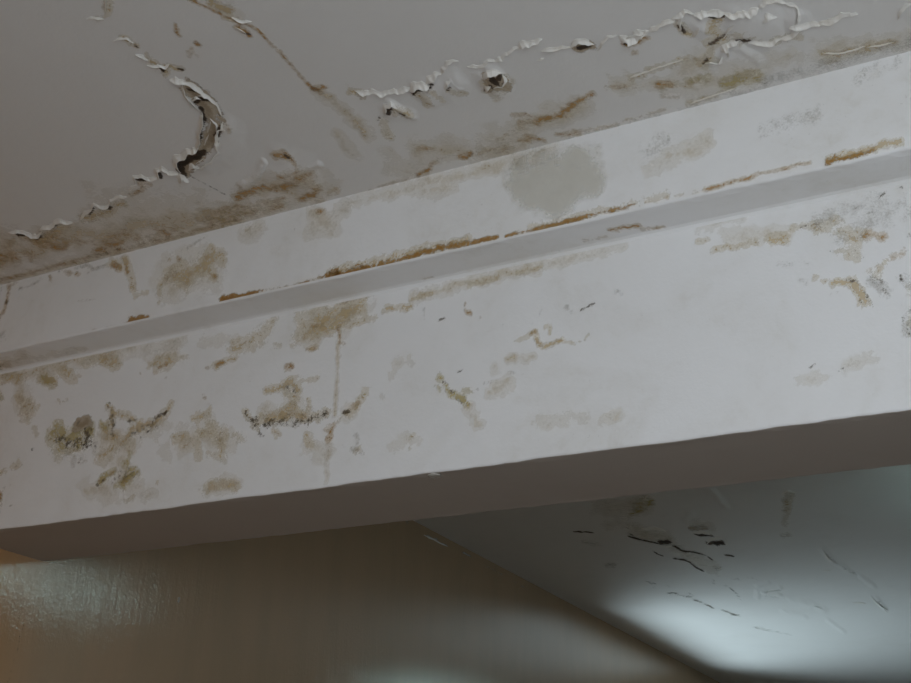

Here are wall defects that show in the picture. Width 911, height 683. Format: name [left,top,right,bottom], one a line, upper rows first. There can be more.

peeling [351,0,858,123]
leakage [536,93,594,125]
peeling [8,37,250,240]
leakage [234,139,331,213]
leakage [509,148,602,215]
leakage [46,402,170,455]
leakage [244,410,328,436]
leakage [96,460,138,487]
crack [626,526,713,572]